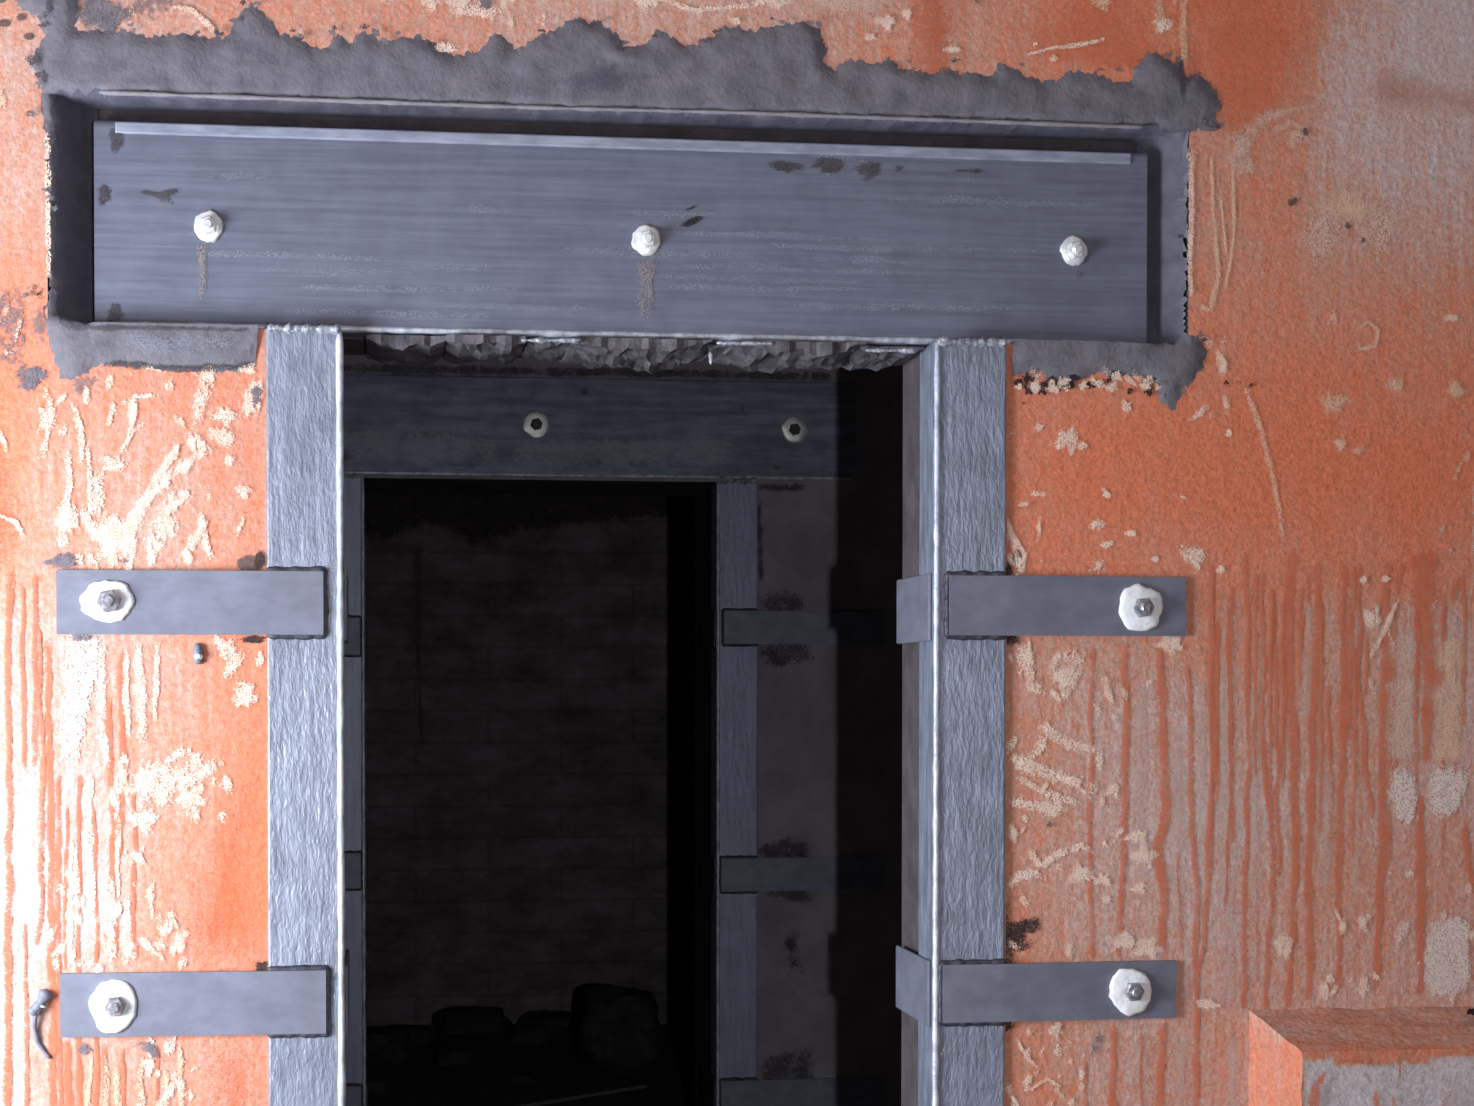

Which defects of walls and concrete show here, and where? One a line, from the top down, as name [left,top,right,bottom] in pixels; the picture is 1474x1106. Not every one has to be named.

peeling [767,154,904,181]
peeling [43,132,52,278]
peeling [56,372,138,463]
spalling [366,334,925,374]
peeling [1009,422,1089,456]
spalling [1014,367,1162,413]
peeling [42,490,212,574]
peeling [1006,490,1047,575]
peeling [1088,519,1137,576]
peeling [212,635,264,709]
peeling [43,634,232,973]
peeling [77,1036,196,1106]